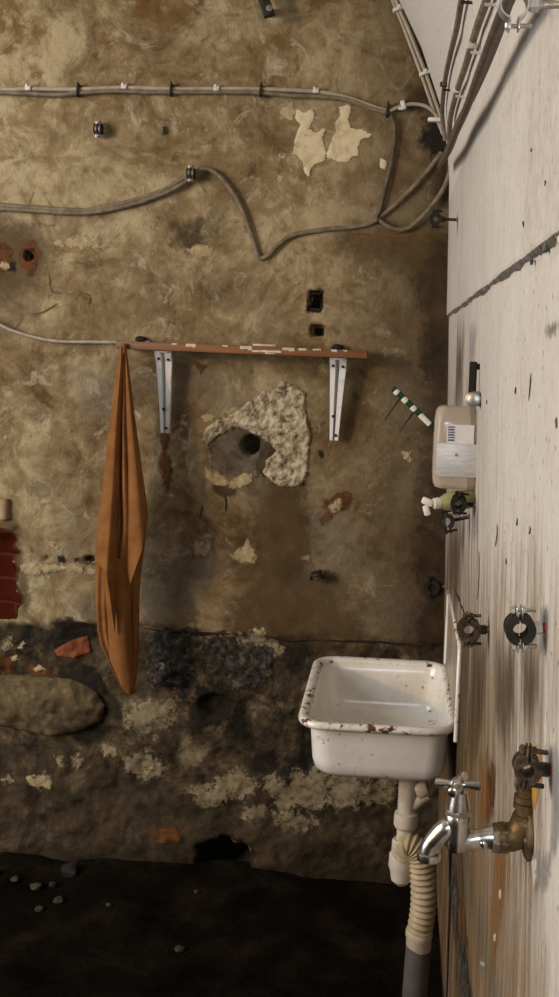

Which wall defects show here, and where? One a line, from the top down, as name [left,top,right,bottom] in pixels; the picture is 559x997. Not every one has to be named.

peeling [278,100,371,177]
flaking render [201,380,323,496]
spalling [195,833,254,868]
leakage [448,600,559,997]